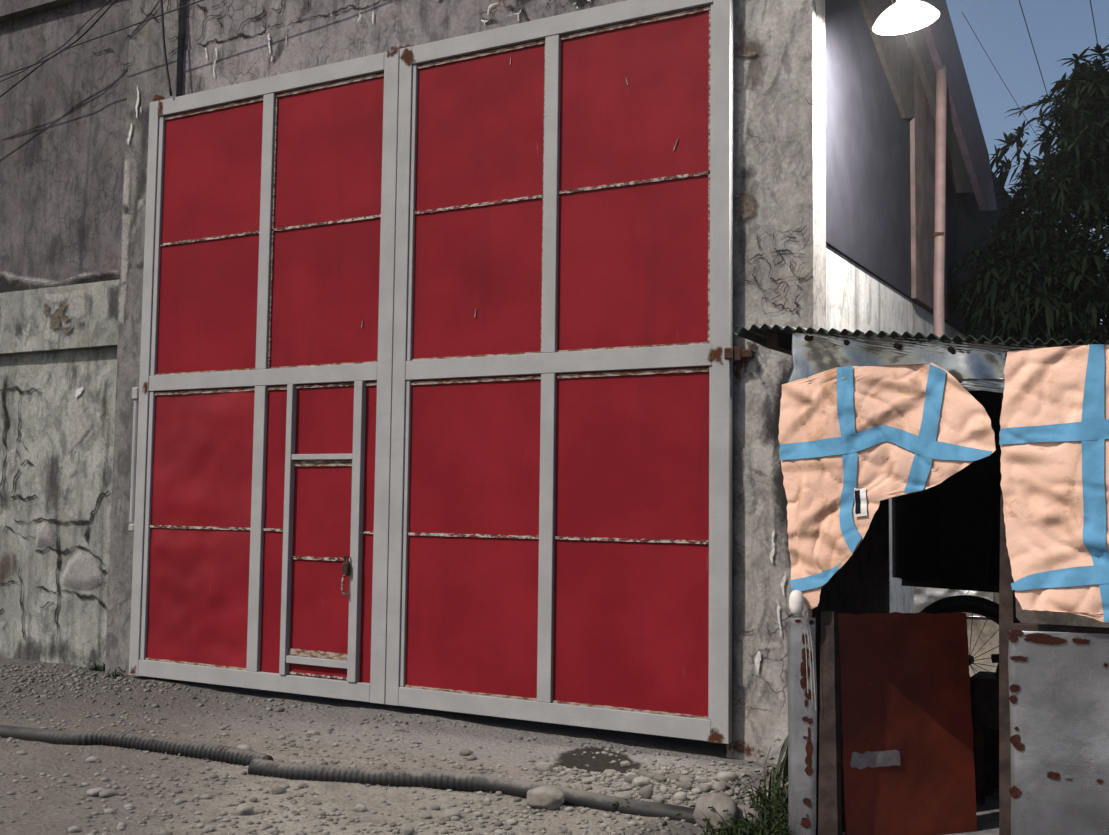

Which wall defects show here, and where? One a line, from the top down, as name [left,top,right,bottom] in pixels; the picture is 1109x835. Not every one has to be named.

crack [92,0,391,74]
crack [482,0,596,23]
crack [745,225,813,315]
crack [0,381,109,639]
flaking render [743,449,755,524]
damp [763,363,793,637]
flaking render [737,572,765,687]
rust [1008,630,1090,645]
rust [795,619,814,776]
rust [1009,684,1020,704]
rust [1009,726,1024,751]
rust [801,798,811,828]